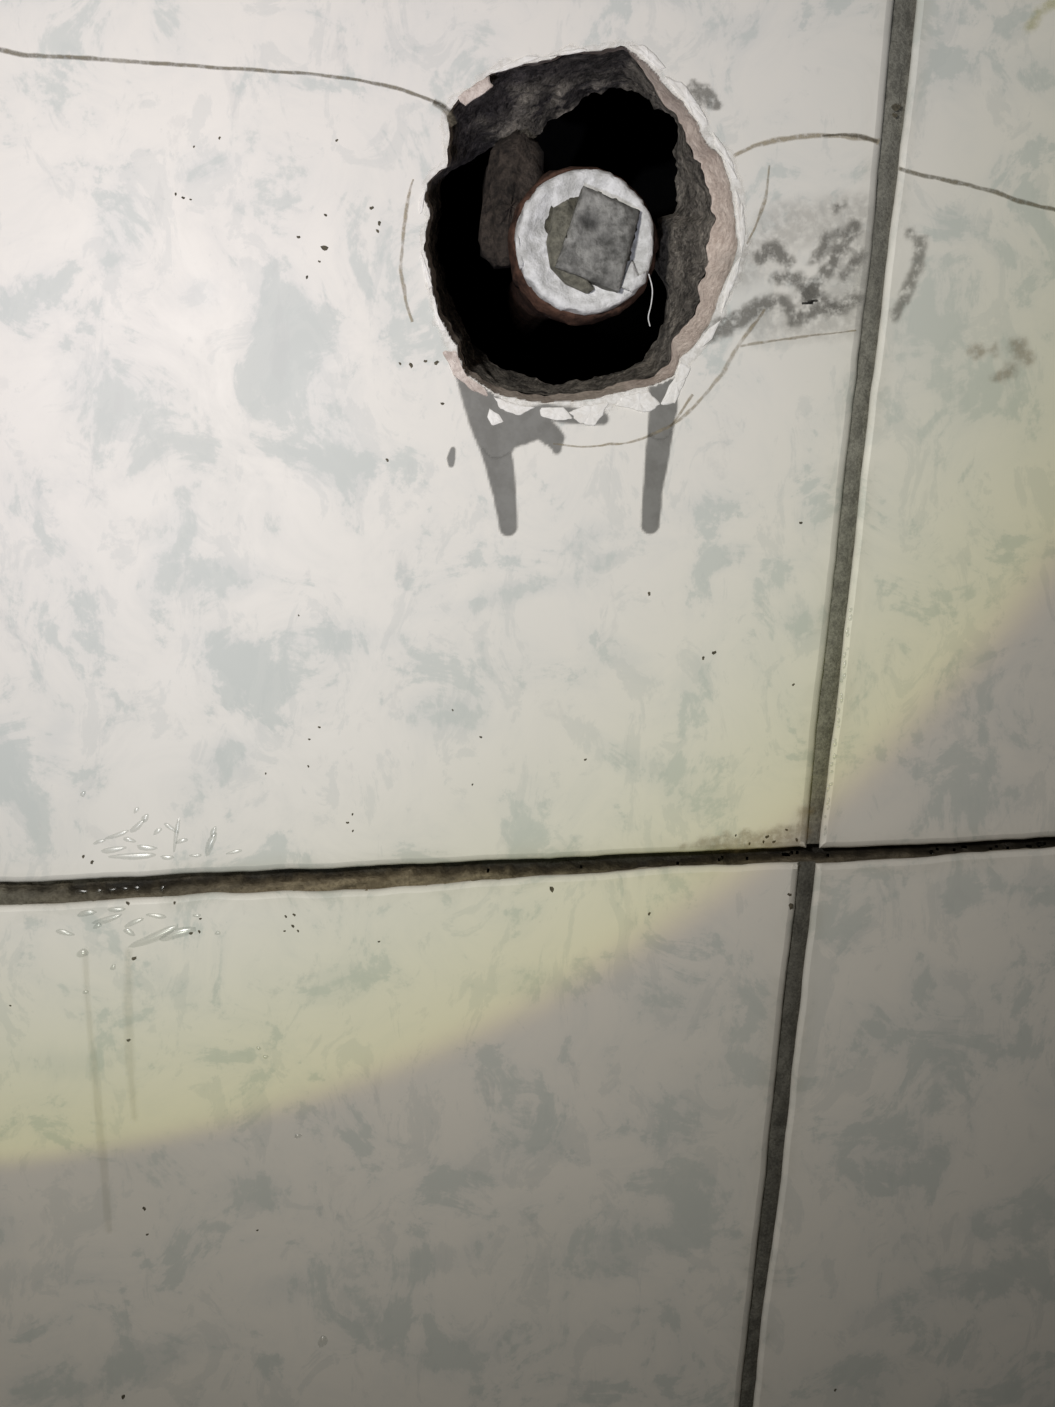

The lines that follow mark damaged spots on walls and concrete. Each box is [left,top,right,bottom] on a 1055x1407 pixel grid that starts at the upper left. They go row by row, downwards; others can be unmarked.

crack [0,48,453,125]
spalling [419,42,750,426]
crack [737,133,1055,238]
damp [447,447,455,467]
damp [458,379,579,535]
crack [558,394,694,447]
damp [642,379,677,533]